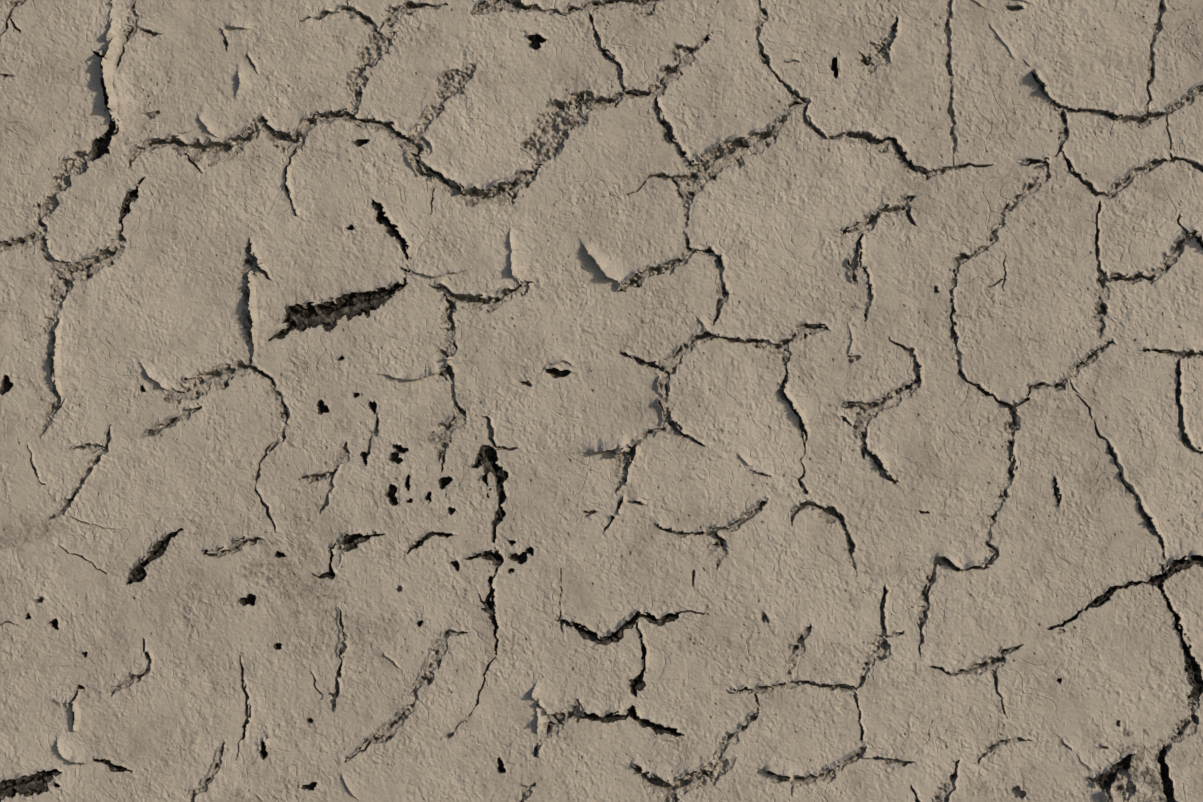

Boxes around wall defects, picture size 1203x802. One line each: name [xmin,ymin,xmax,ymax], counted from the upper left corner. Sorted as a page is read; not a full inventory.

spalling [317,399,329,415]
spalling [353,393,379,466]
spalling [389,444,409,464]
spalling [385,455,453,506]
crack [0,0,995,741]
crack [629,0,1203,802]
spalling [508,540,534,574]
crack [0,688,135,802]
crack [188,653,255,802]
crack [339,629,468,800]
crack [519,568,708,802]
spalling [1056,719,1171,802]